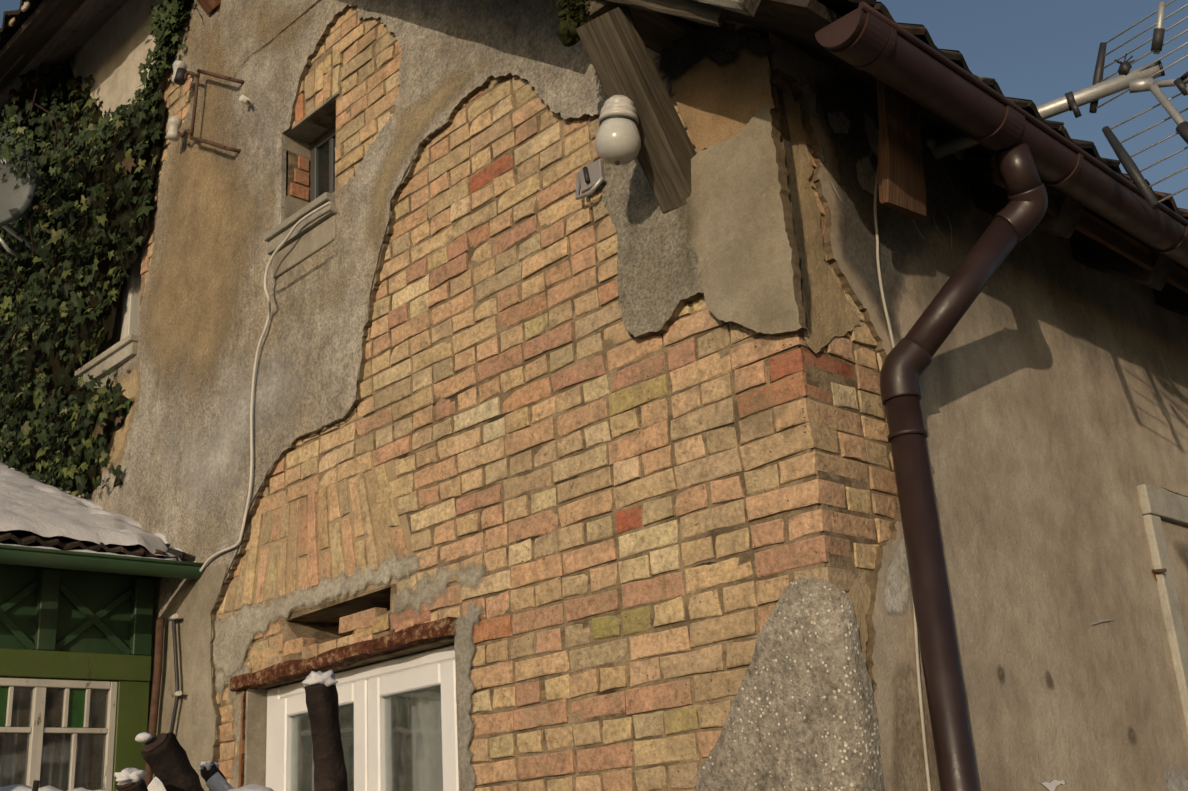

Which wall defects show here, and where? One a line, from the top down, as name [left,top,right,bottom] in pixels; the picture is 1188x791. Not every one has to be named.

peeling [290,4,402,189]
peeling [211,47,901,791]
damp [815,75,987,336]
damp [983,249,1188,396]